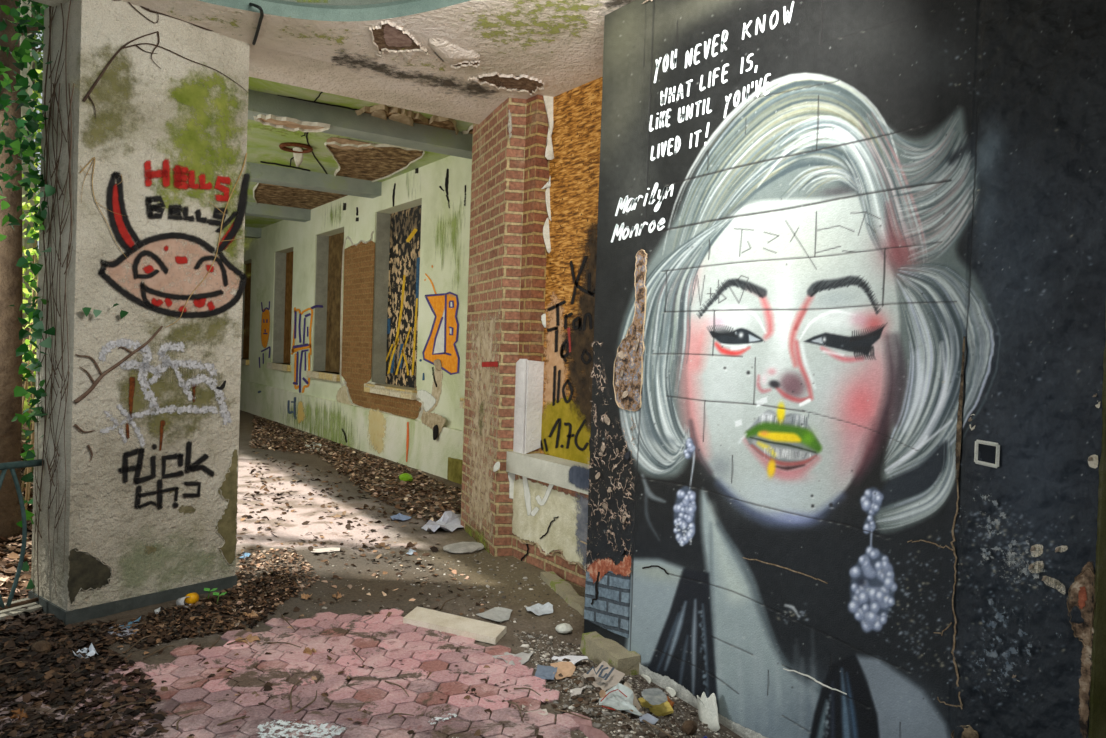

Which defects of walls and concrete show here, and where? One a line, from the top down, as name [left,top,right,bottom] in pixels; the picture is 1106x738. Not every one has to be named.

spalling [369,20,429,64]
spalling [450,60,554,160]
spalling [253,114,425,182]
peeling [542,178,551,253]
spalling [517,249,648,638]
peeling [1088,455,1098,468]
spalling [215,450,238,565]
spalling [67,548,113,606]
crack [907,480,963,709]
spalling [1029,544,1095,738]
spalling [951,725,979,738]